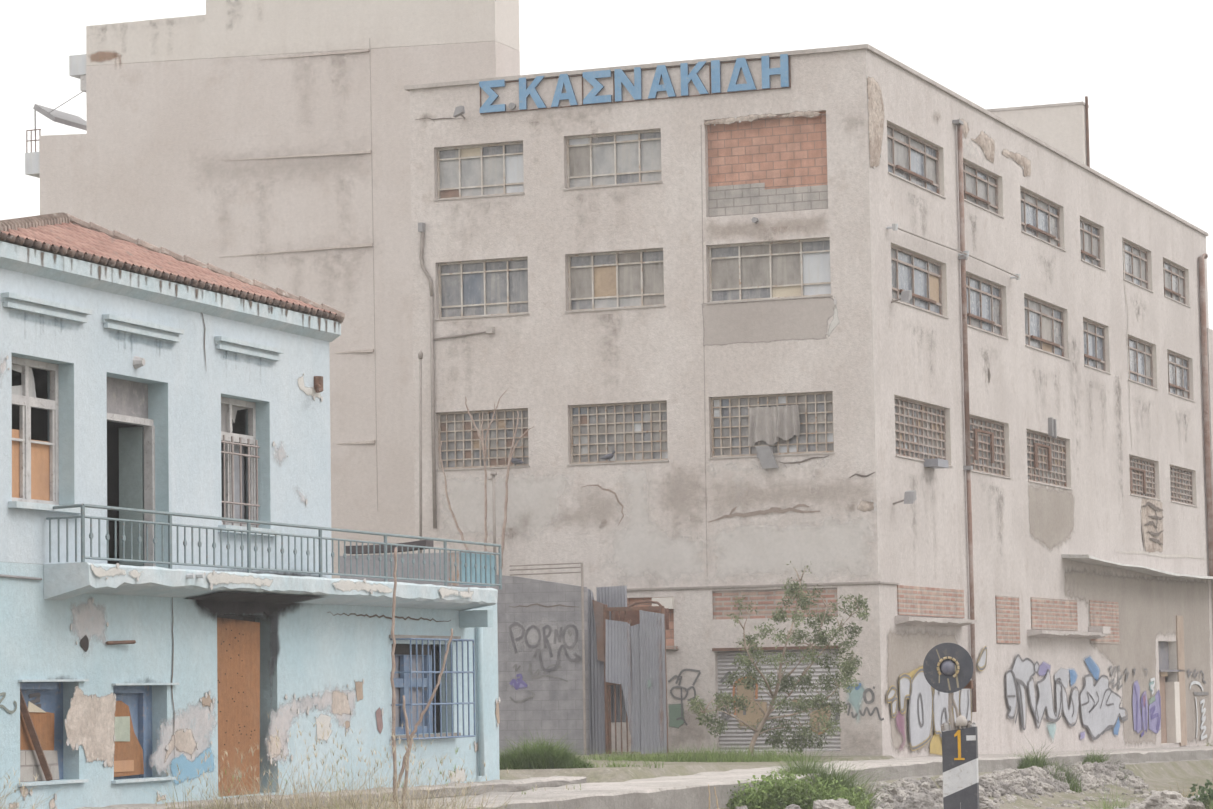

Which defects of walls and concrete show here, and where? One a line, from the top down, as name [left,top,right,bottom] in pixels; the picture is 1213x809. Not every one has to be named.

spalling [704,110,829,126]
spalling [959,118,1031,177]
crack [583,485,624,525]
crack [708,504,820,522]
peeling [204,570,273,590]
crack [327,612,451,622]
peeling [64,686,116,768]
peeling [151,690,216,775]
peeling [268,679,364,766]